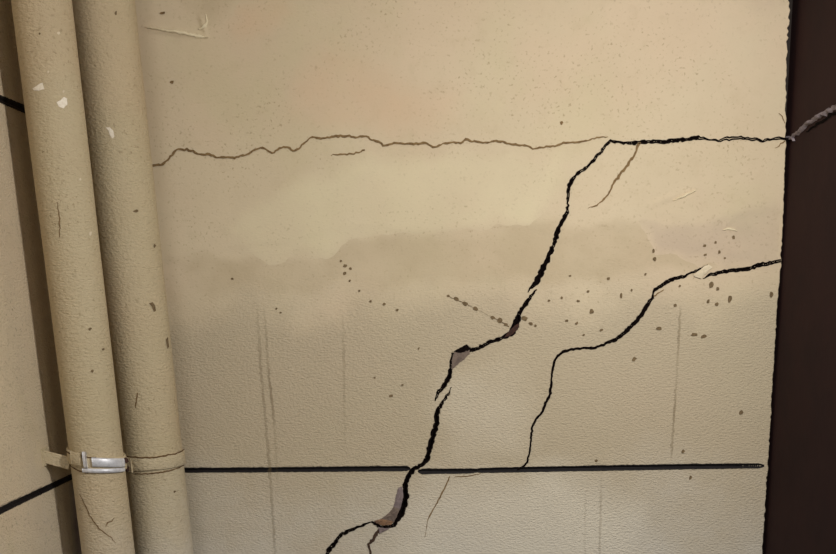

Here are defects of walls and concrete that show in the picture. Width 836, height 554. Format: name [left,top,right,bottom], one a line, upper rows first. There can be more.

crack [152,104,836,554]
flaking render [452,344,471,369]
flaking render [375,487,403,533]